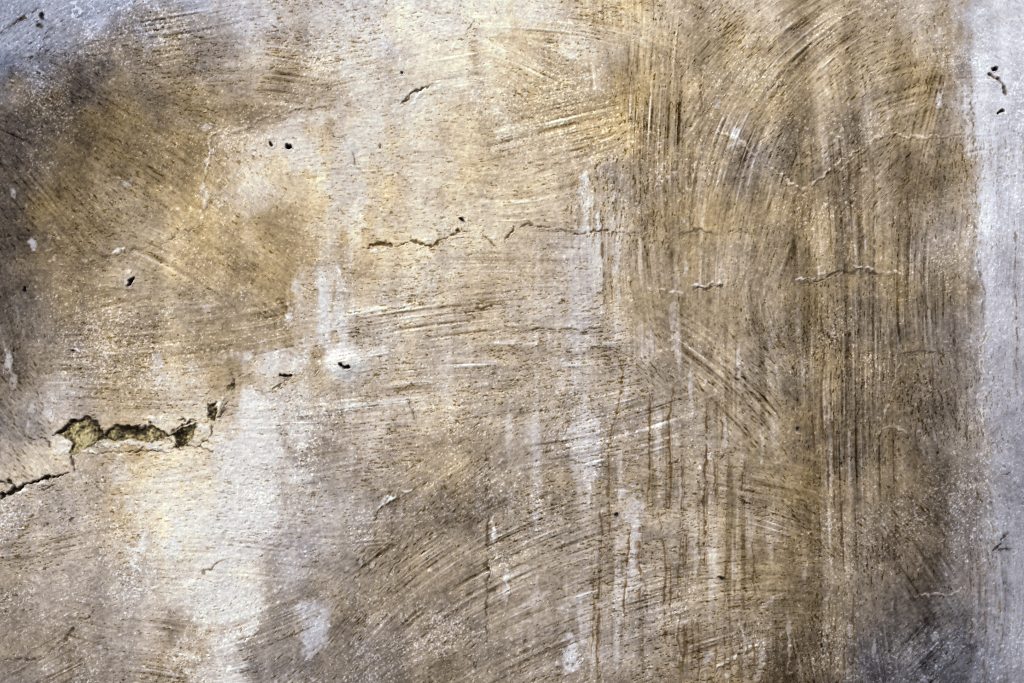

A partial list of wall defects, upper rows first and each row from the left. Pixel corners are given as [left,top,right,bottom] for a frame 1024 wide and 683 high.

crack [393,79,443,107]
crack [362,220,643,254]
crack [705,33,1013,683]
spalling [27,374,242,473]
crack [0,471,70,504]